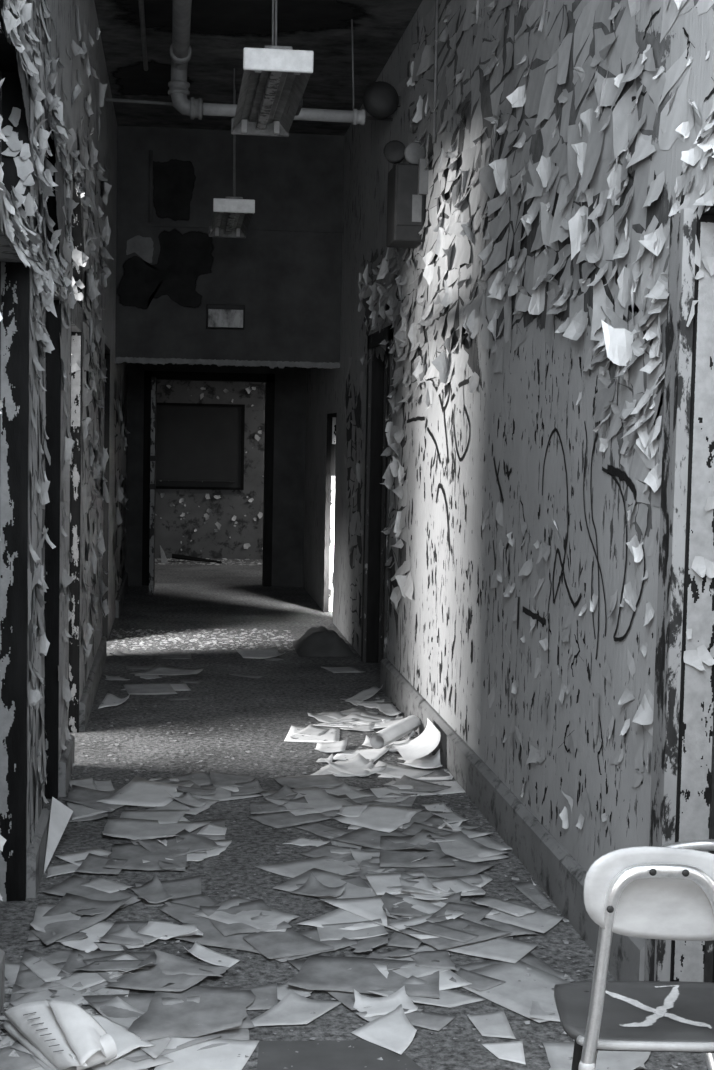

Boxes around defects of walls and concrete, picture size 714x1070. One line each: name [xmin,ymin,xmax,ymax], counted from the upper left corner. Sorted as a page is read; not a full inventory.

peeling [0,0,130,901]
peeling [674,940,705,982]